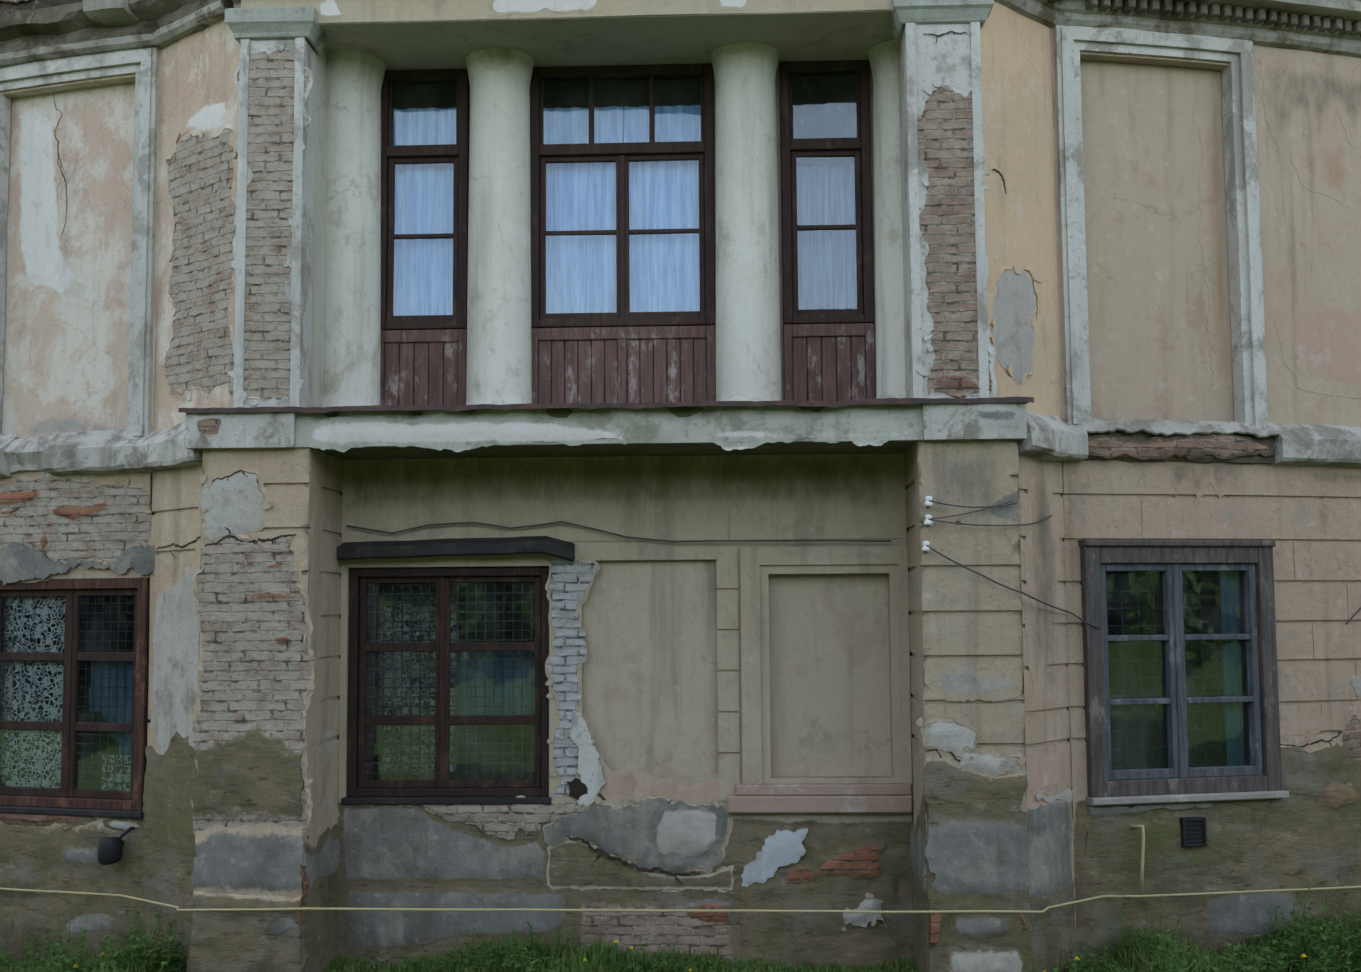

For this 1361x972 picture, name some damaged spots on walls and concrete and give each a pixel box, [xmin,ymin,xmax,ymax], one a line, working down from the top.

crack [53,93,67,237]
flaking render [158,43,313,440]
flaking render [917,80,1037,427]
flaking render [0,473,153,574]
peeling [307,416,630,453]
peeling [703,425,917,451]
flaking render [149,467,324,828]
spalling [420,709,908,971]
flaking render [915,662,1073,897]
peeling [1280,677,1361,740]